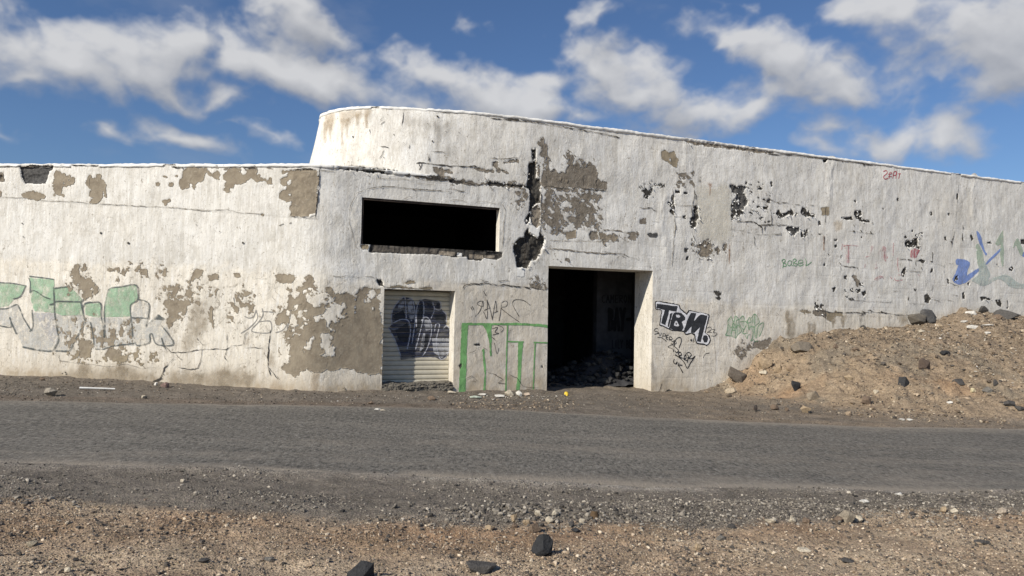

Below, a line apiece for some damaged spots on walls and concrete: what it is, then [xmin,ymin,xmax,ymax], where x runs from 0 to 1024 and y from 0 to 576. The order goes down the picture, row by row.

peeling [21,170,107,203]
peeling [156,167,319,217]
peeling [415,137,658,263]
peeling [639,150,700,199]
peeling [685,238,727,263]
peeling [65,263,98,301]
peeling [107,261,260,329]
peeling [271,273,433,377]